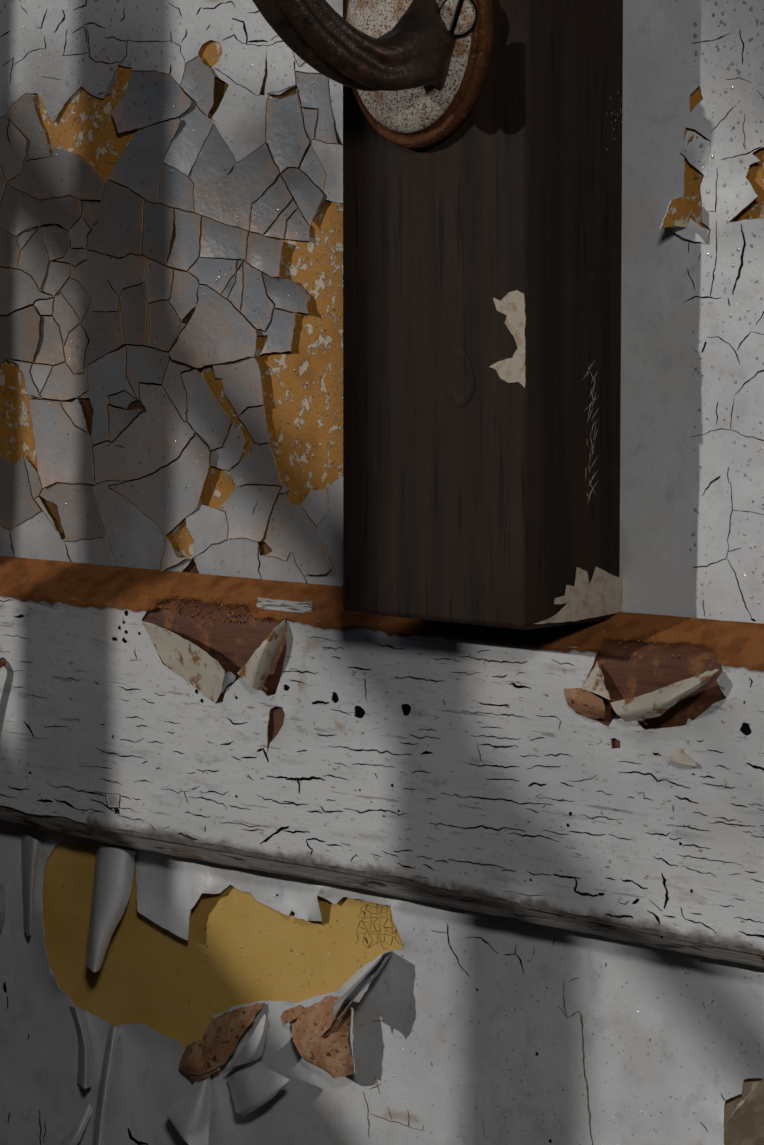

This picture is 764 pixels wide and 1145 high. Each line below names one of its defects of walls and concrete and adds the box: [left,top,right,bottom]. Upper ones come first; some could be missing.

crack [0,0,295,96]
crack [685,30,764,306]
peeling [730,147,764,222]
peeling [0,40,343,575]
crack [692,311,764,441]
crack [693,468,764,621]
peeling [112,610,285,703]
rust [0,556,764,671]
peeling [564,661,719,722]
crack [0,599,764,960]
peeling [21,833,403,1145]
peeling [724,1078,764,1145]